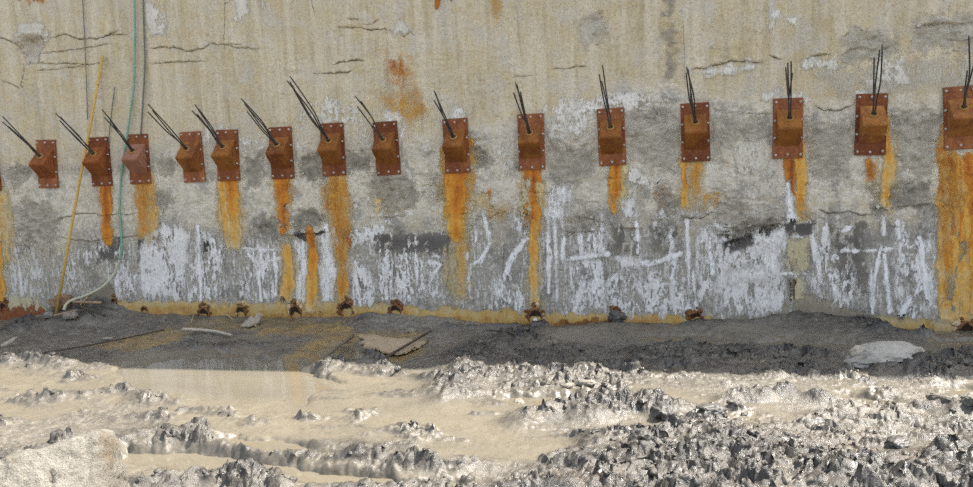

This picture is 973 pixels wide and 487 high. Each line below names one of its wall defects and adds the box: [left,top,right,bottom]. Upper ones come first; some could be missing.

rust [0,186,15,302]
rust [98,186,113,246]
rust [215,172,246,249]
rust [274,179,323,312]
rust [321,175,353,313]
rust [438,137,510,303]
leakage [0,178,967,331]
rust [520,170,546,309]
rust [608,165,628,215]
rust [783,143,812,223]
rust [865,116,898,213]
rust [934,124,973,323]